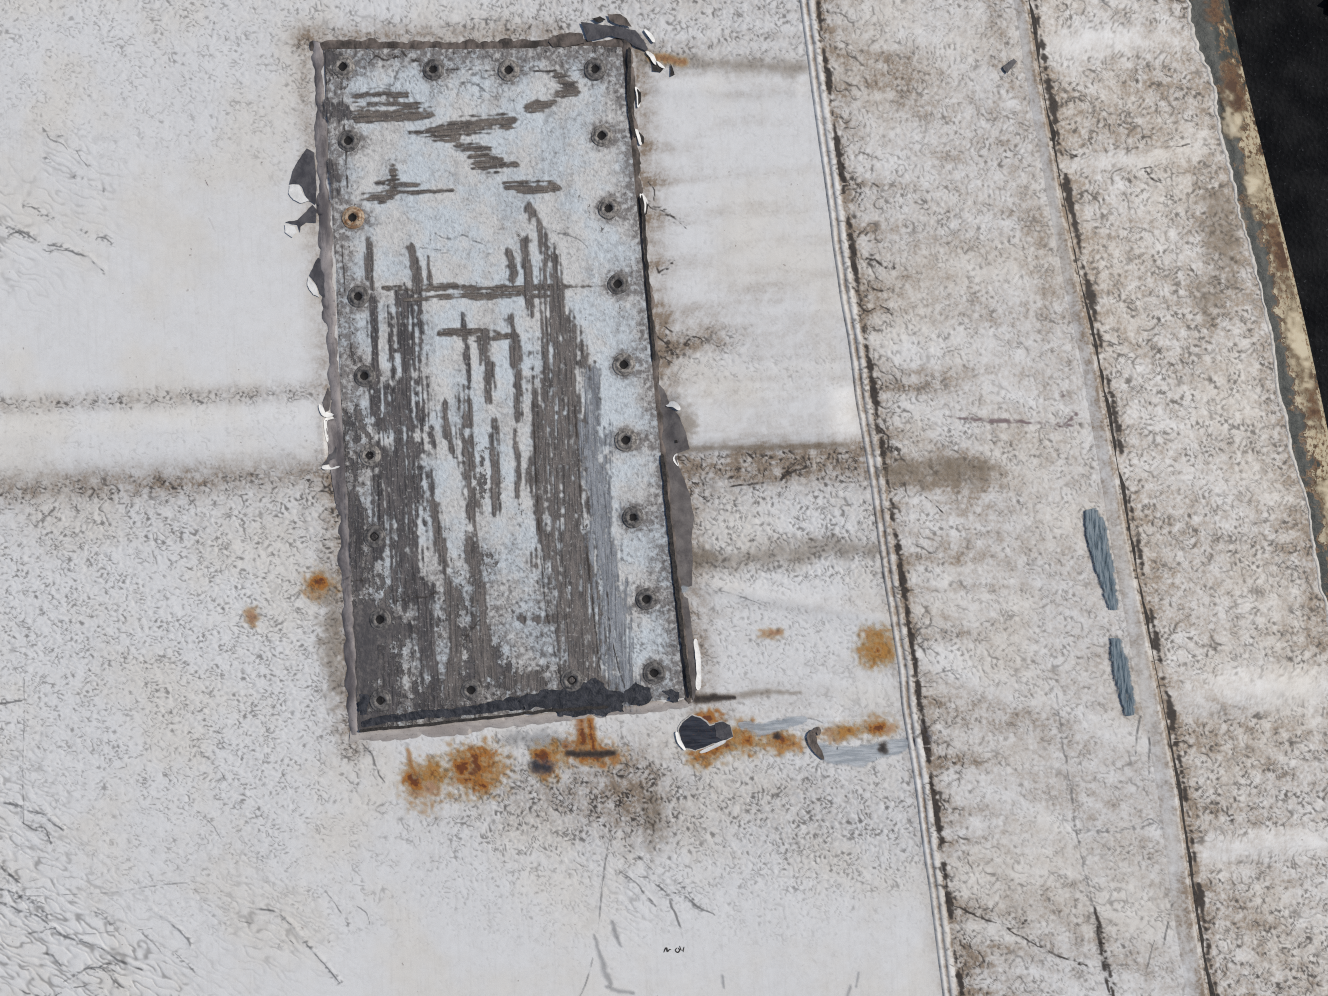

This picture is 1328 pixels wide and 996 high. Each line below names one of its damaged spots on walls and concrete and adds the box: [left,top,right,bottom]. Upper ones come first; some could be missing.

peeling [549,14,675,76]
corrosion [1221,64,1247,115]
peeling [285,149,341,237]
peeling [319,69,641,722]
peeling [657,383,701,702]
corrosion [303,572,334,600]
corrosion [857,627,895,668]
corrosion [402,737,511,808]
corrosion [530,715,626,782]
peeling [675,732,726,753]
corrosion [687,708,803,769]
corrosion [822,716,896,743]